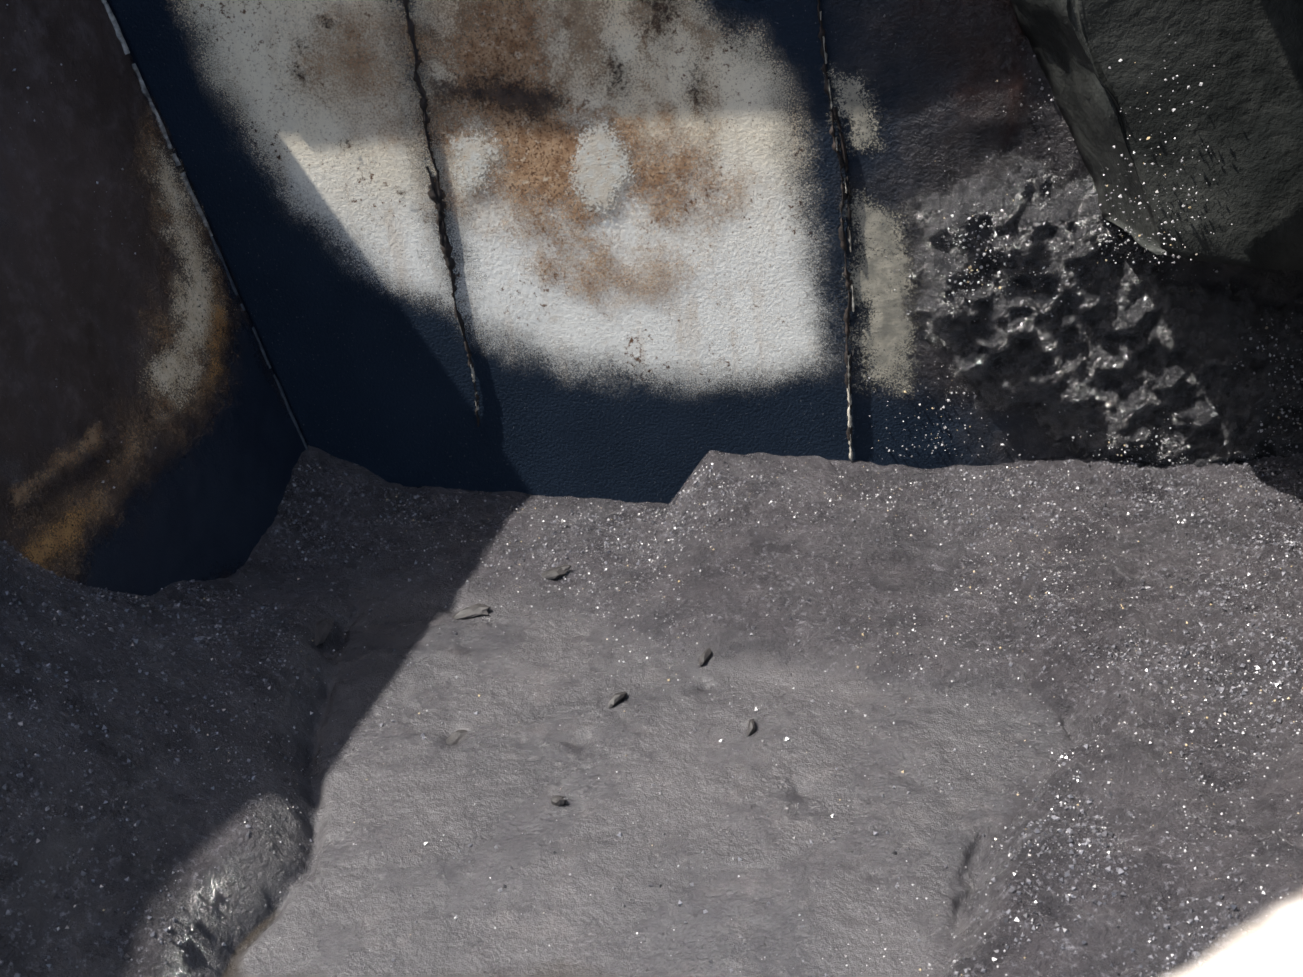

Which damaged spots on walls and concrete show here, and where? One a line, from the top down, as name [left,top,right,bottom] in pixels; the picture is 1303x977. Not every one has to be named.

corrosion [3,104,237,578]
damp [69,188,308,596]
crack [403,0,480,427]
damp [425,62,569,122]
peeling [180,0,826,390]
corrosion [404,0,744,306]
crack [817,0,855,460]